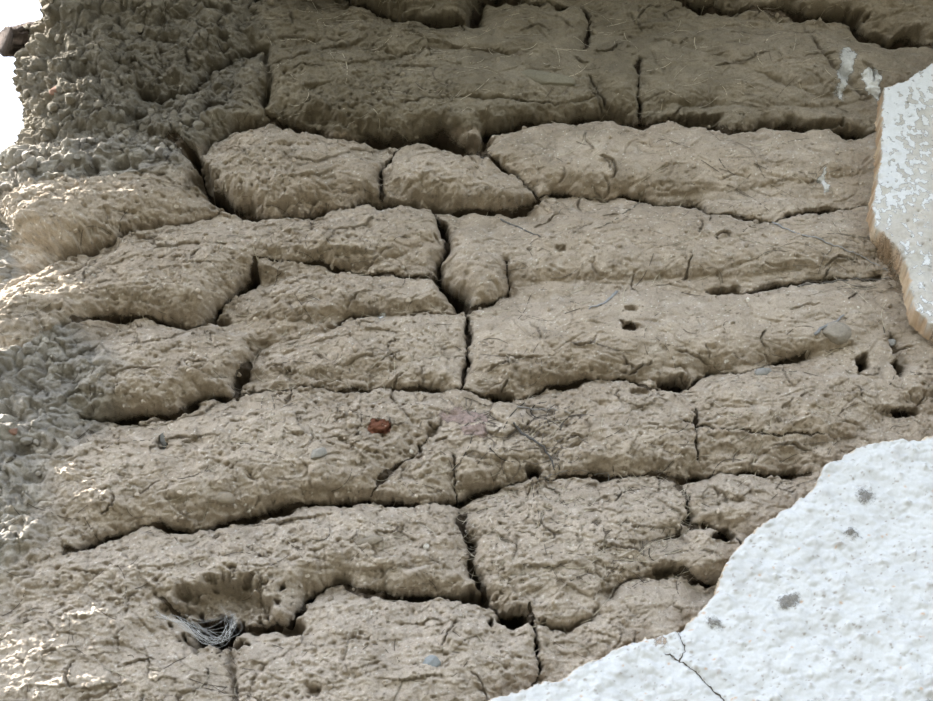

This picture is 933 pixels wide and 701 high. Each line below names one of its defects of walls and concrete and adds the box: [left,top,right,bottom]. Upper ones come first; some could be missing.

crack [707,123,807,135]
crack [166,131,261,222]
flaking render [866,63,933,342]
crack [70,313,172,327]
crack [216,256,345,324]
crack [339,122,661,402]
crack [109,362,263,426]
crack [540,350,825,545]
crack [62,521,189,555]
crack [213,436,506,625]
crack [246,584,444,636]
crack [665,632,725,701]